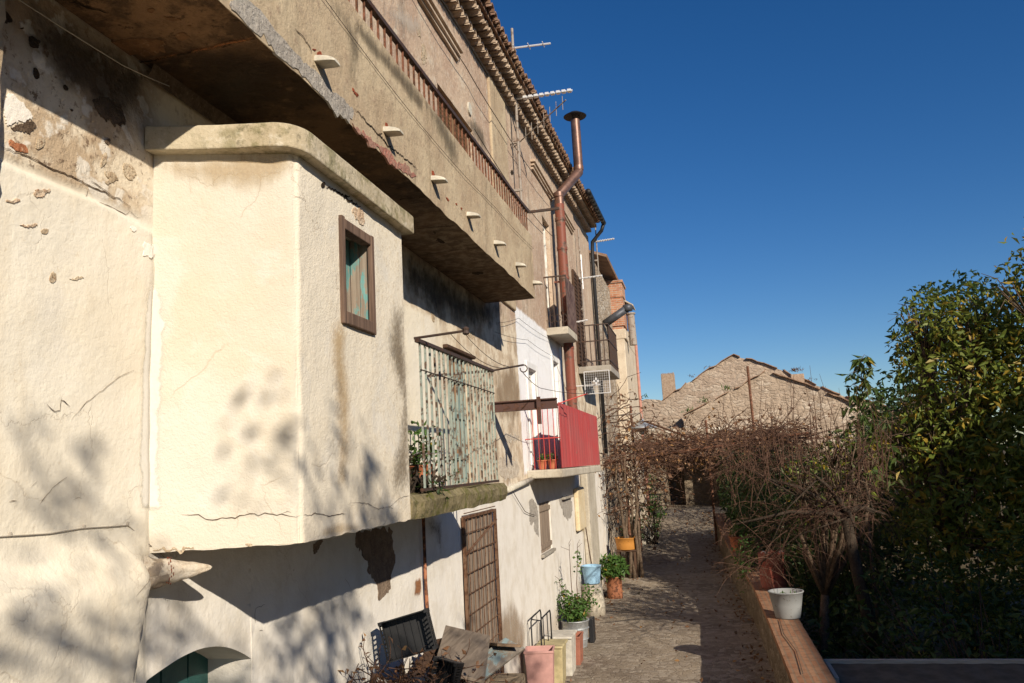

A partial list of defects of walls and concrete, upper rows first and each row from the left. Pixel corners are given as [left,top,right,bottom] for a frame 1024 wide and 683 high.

damp [37,27,139,117]
flaking render [229,0,416,178]
flaking render [9,120,45,153]
flaking render [92,98,137,185]
crack [1,146,138,218]
crack [183,495,411,520]
flaking render [355,526,395,601]